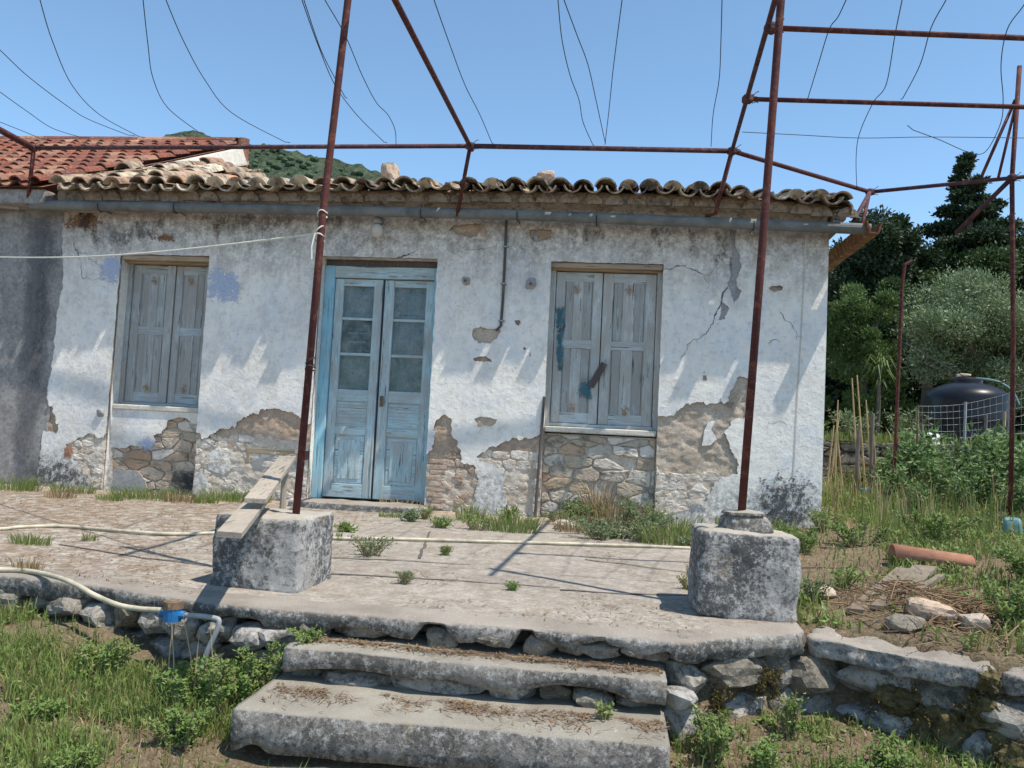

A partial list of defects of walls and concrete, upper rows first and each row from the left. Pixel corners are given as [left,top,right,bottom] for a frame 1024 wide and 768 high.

flaking render [472,327,500,343]
crack [665,264,729,359]
flaking render [36,401,59,433]
flaking render [64,431,106,490]
flaking render [193,406,311,502]
flaking render [424,414,543,517]
flaking render [654,377,748,522]